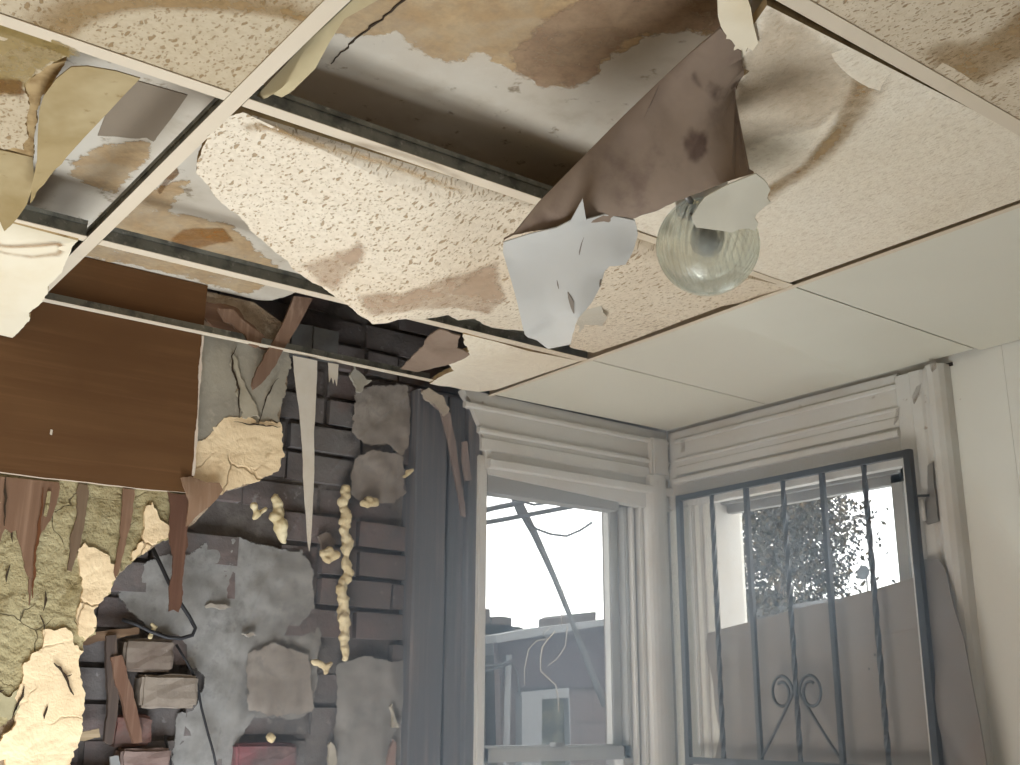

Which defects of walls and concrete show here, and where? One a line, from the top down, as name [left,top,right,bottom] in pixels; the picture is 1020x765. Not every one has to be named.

leakage [0,0,307,95]
crack [331,0,405,64]
leakage [336,0,721,89]
leakage [941,15,1020,80]
flaking render [349,366,372,393]
flaking render [194,335,292,495]
flaking render [317,532,336,550]
crack [39,591,47,630]
flaking render [0,473,186,765]
crack [0,686,25,717]
crack [54,663,74,695]
flaking render [327,742,337,765]